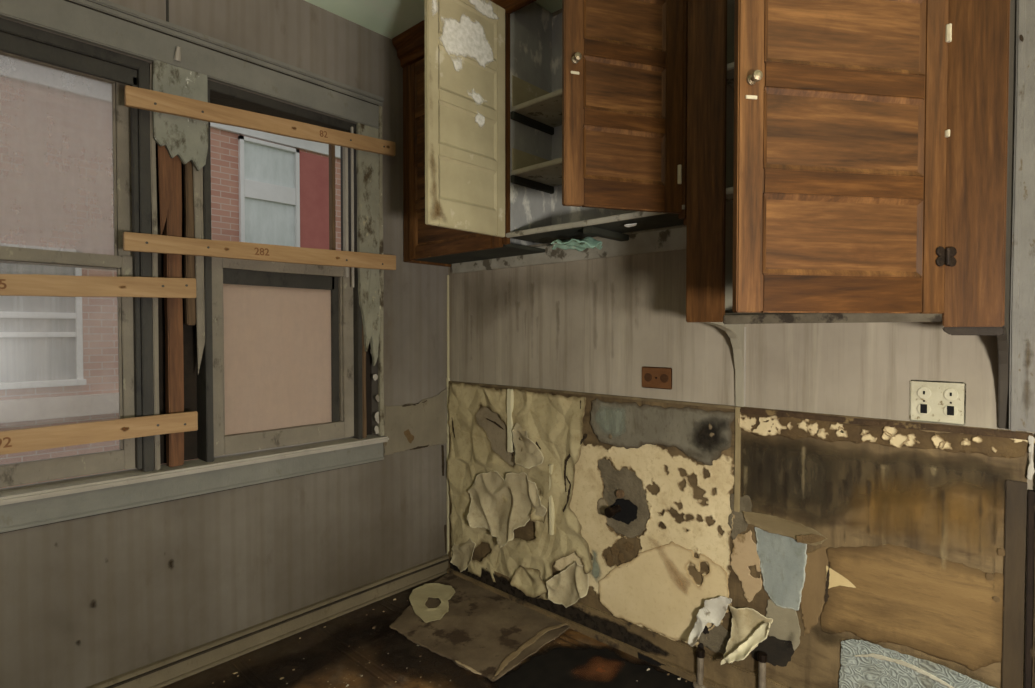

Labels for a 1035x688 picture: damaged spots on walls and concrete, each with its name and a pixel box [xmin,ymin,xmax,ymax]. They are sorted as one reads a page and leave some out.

flaking render [553,398,1035,667]
leakage [740,438,1007,523]
leakage [228,558,694,688]